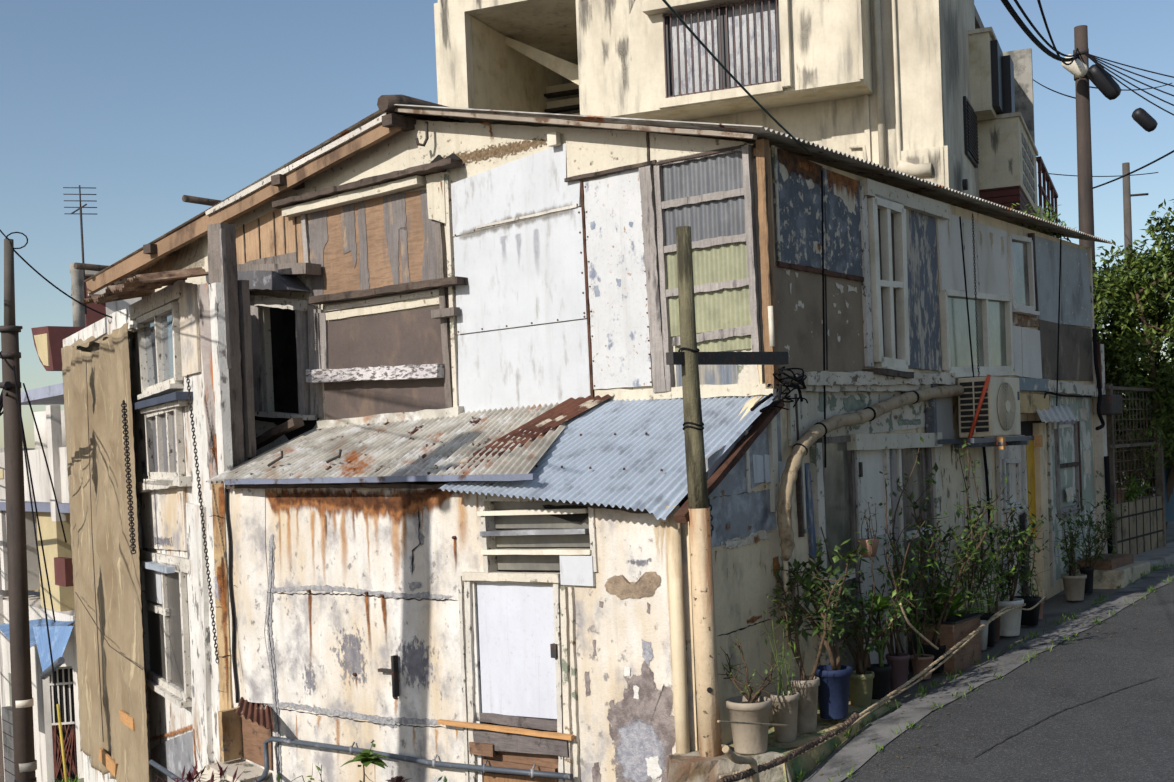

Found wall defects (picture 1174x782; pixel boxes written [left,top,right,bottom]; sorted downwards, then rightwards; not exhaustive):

damp [579,0,592,28]
damp [603,40,628,88]
peeling [779,163,788,182]
peeling [833,183,856,215]
rust [442,394,614,475]
rust [265,489,478,562]
flaking render [599,558,661,614]
peeling [592,640,675,782]